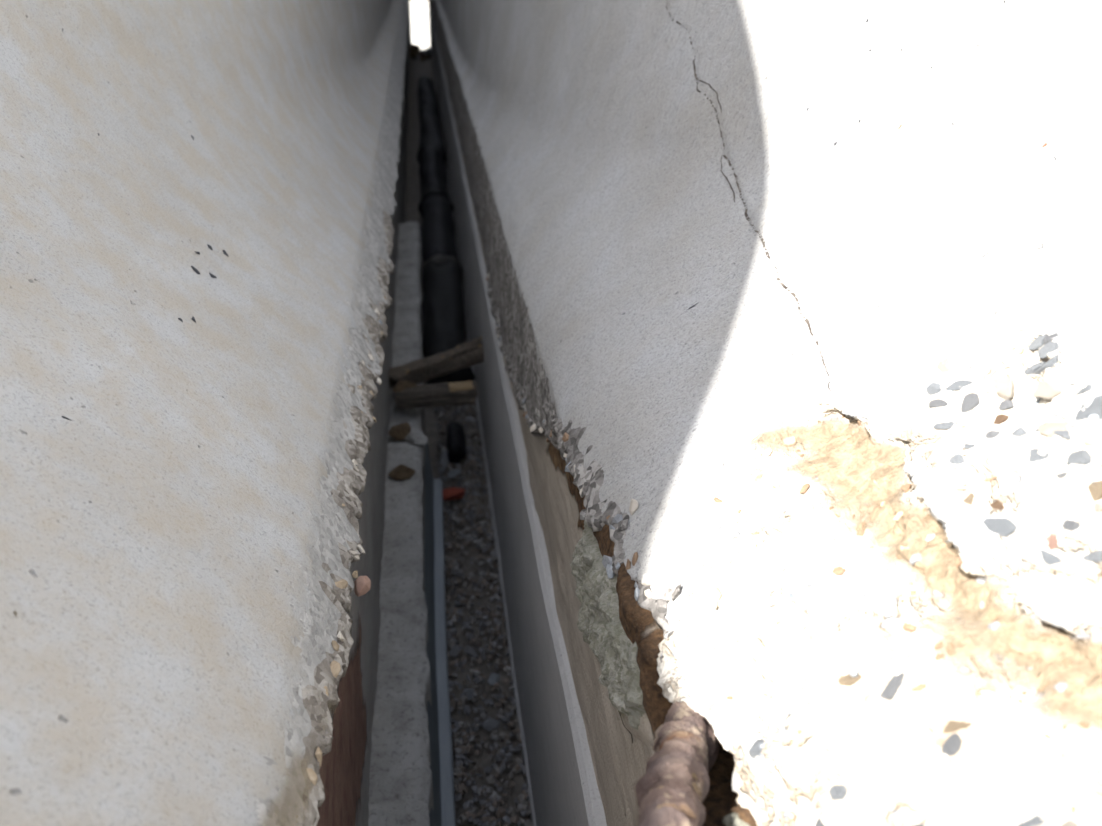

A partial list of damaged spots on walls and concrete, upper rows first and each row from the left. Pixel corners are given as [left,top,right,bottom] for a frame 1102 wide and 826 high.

crack [666,3,831,391]
spalling [301,208,395,826]
rust [702,742,757,826]
spalling [486,272,1102,826]